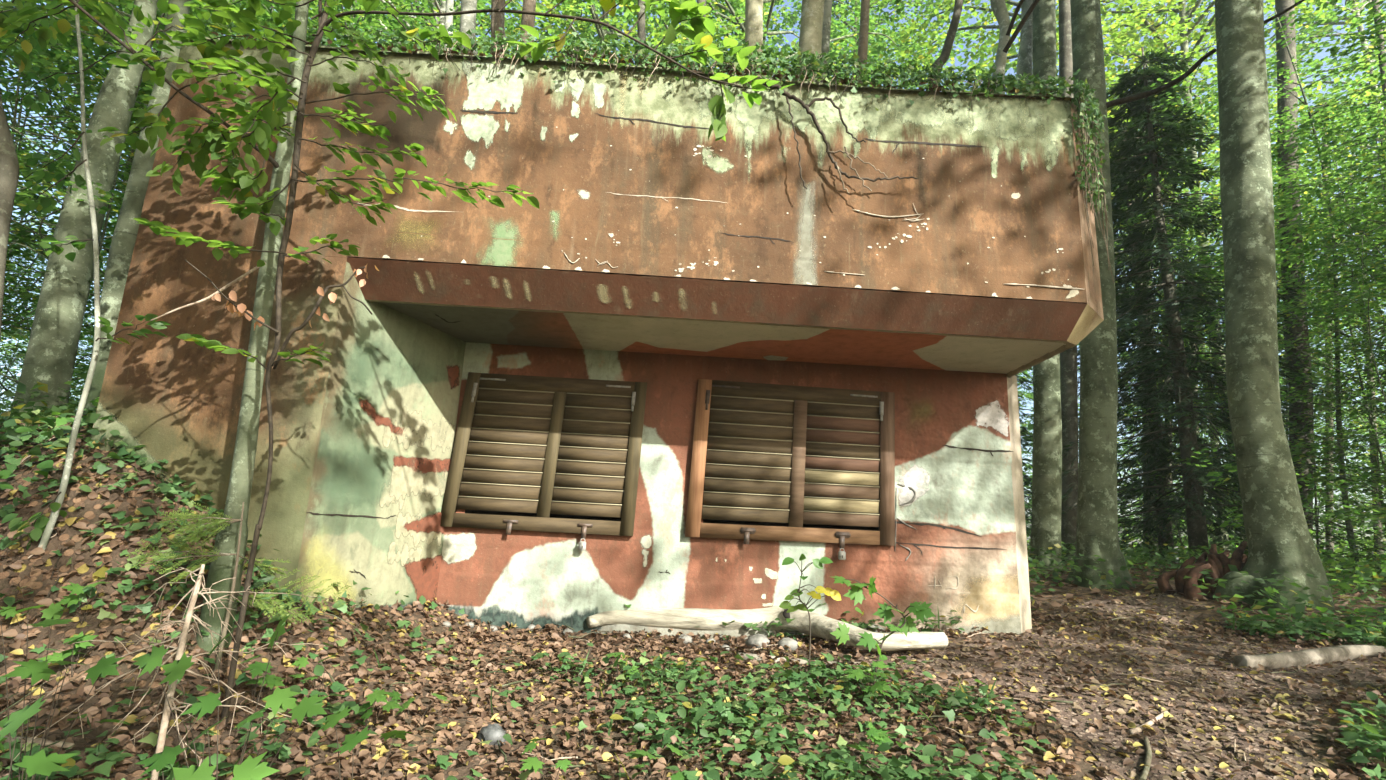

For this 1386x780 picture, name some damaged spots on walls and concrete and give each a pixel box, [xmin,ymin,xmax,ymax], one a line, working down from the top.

peeling [443,55,524,170]
peeling [693,83,1072,199]
crack [862,138,983,153]
peeling [447,365,460,389]
peeling [359,398,403,435]
spalling [975,400,1009,437]
peeling [394,455,451,474]
spalling [898,465,930,506]
peeling [404,512,445,534]
peeling [640,535,652,567]
peeling [405,554,442,604]